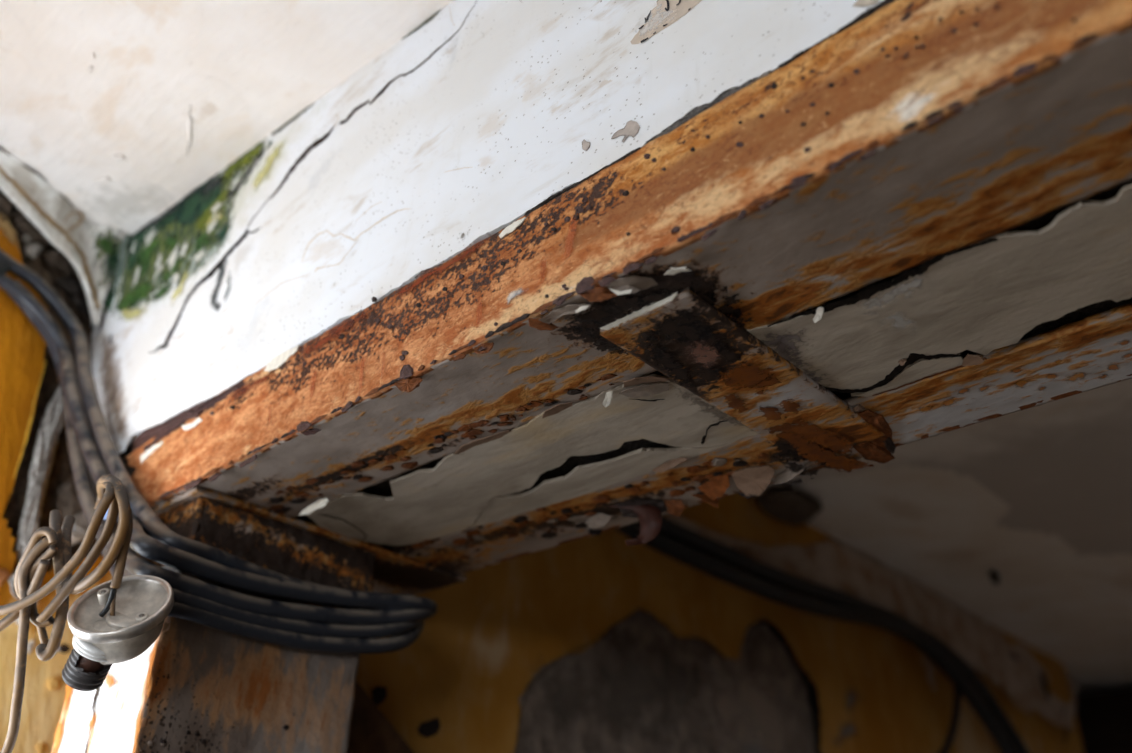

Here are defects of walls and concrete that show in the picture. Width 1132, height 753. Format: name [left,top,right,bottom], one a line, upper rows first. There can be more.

spalling [768,0,896,74]
spalling [0,189,94,336]
water stain [52,73,362,454]
crack [148,1,477,353]
corrosion [398,239,488,297]
spalling [524,80,755,216]
corrosion [671,140,880,242]
crack [768,238,998,327]
corrosion [158,248,743,499]
corrosion [500,309,896,546]
crack [823,353,986,396]
spalling [514,608,816,753]